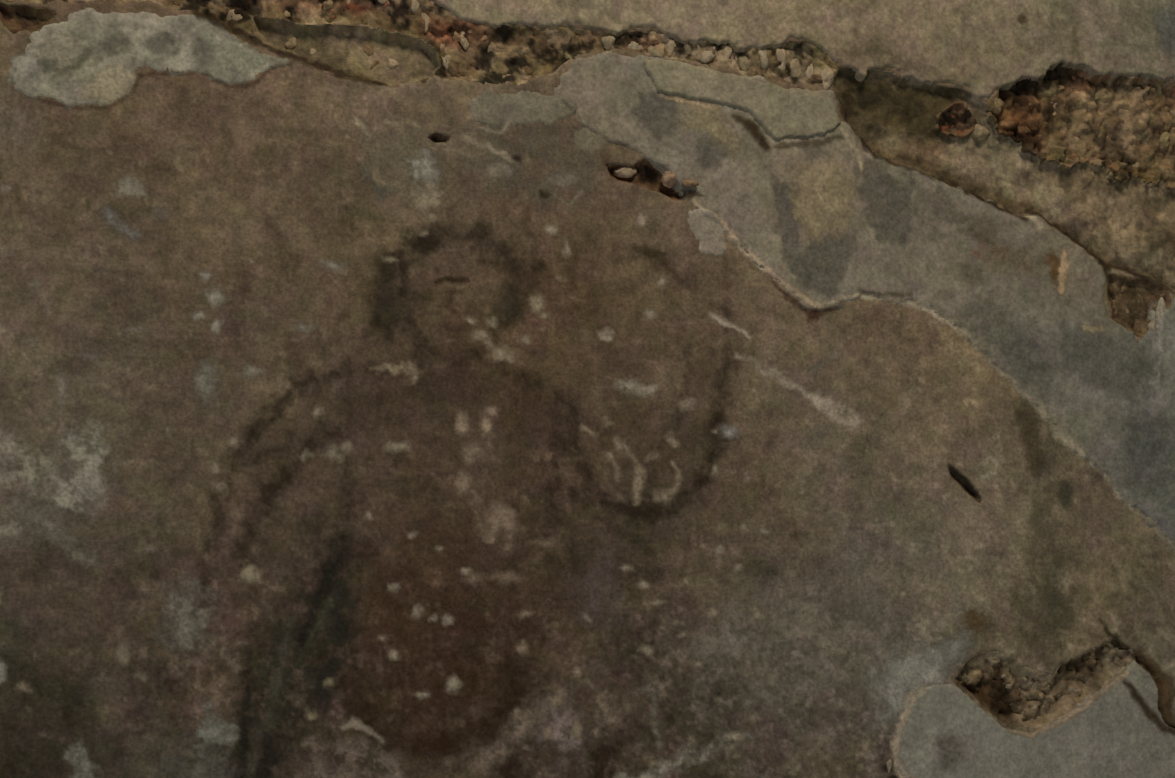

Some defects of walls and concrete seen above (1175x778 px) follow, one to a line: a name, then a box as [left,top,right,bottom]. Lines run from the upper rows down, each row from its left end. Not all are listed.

flaking render [0,0,1175,550]
peeling [413,606,453,625]
peeling [517,639,528,654]
peeling [447,677,461,691]
spalling [890,687,927,778]